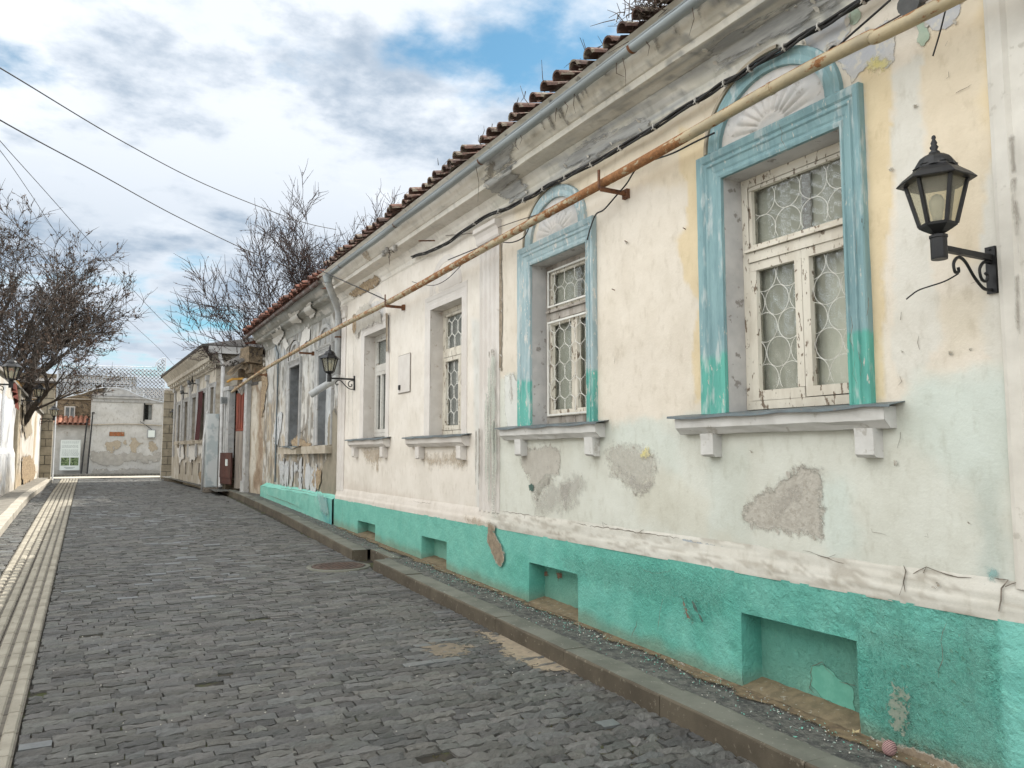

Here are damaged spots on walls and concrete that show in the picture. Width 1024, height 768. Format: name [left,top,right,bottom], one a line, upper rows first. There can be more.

peeling [917,4,961,46]
peeling [838,36,895,82]
peeling [261,362,321,492]
peeling [90,432,161,473]
flaking render [520,445,560,500]
flaking render [742,465,825,540]
spalling [486,522,505,567]
crack [899,565,971,595]
crack [996,578,1016,611]
spalling [406,561,966,768]